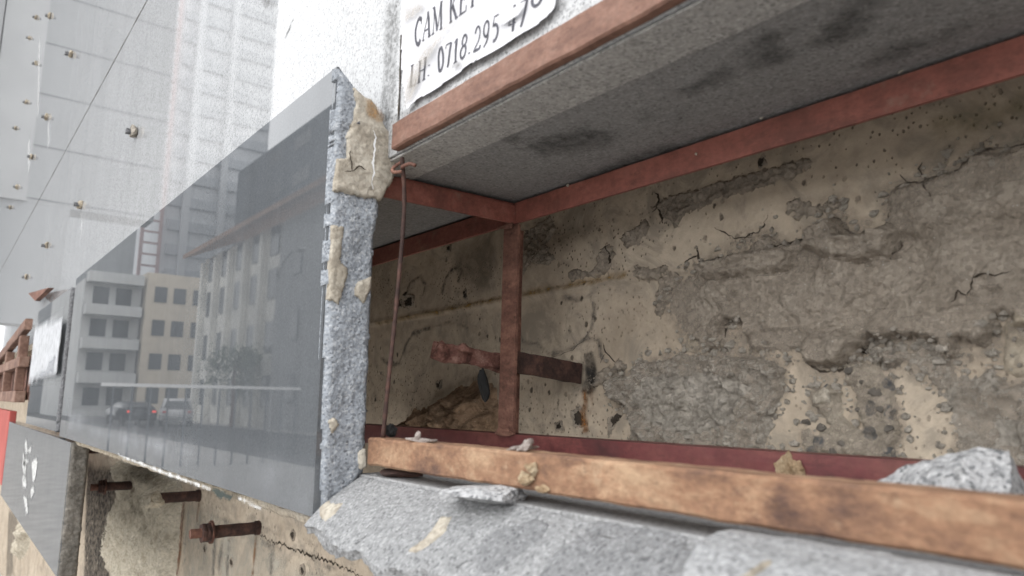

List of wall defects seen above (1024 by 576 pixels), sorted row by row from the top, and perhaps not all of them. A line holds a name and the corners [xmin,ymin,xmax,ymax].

peeling [568,154,813,282]
peeling [785,197,841,221]
crack [833,143,1024,260]
spalling [318,69,378,506]
peeling [632,264,683,319]
crack [951,271,1010,302]
peeling [1002,312,1024,378]
rust [581,356,596,432]
spalling [779,347,919,458]
spalling [100,456,260,576]
crack [259,534,359,576]